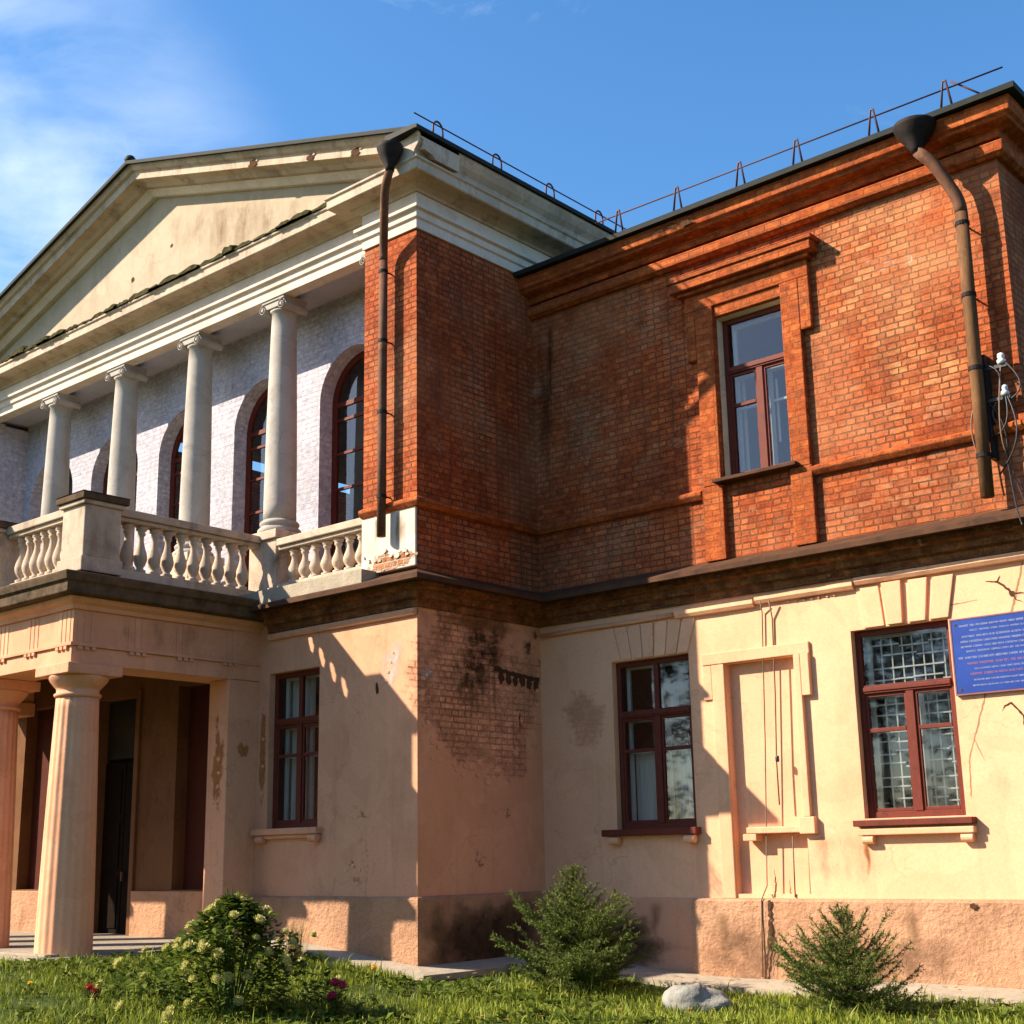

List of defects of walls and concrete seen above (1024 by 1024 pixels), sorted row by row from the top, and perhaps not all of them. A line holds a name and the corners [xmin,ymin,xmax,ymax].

spalling [362,548,418,572]
crack [950,562,1024,612]
spalling [372,610,541,785]
peeling [212,719,223,803]
peeling [238,710,265,795]
crack [969,694,1024,796]